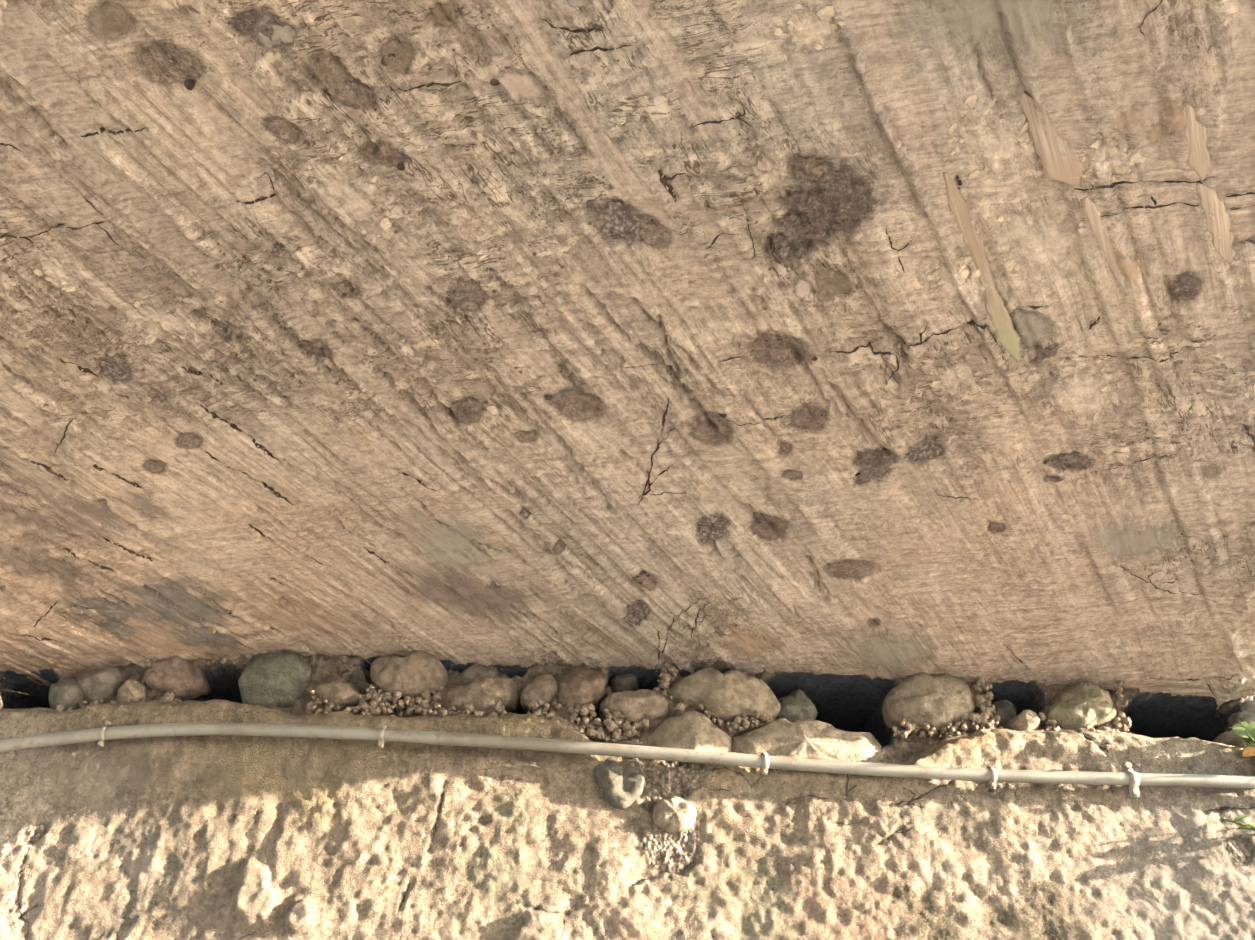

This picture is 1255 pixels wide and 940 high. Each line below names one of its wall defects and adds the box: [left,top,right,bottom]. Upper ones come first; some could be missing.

crack [0,196,138,260]
peeling [941,95,1100,298]
crack [1074,177,1255,217]
peeling [925,257,989,317]
crack [832,319,998,381]
spalling [1009,308,1059,363]
crack [638,398,695,505]
crack [7,818,39,940]